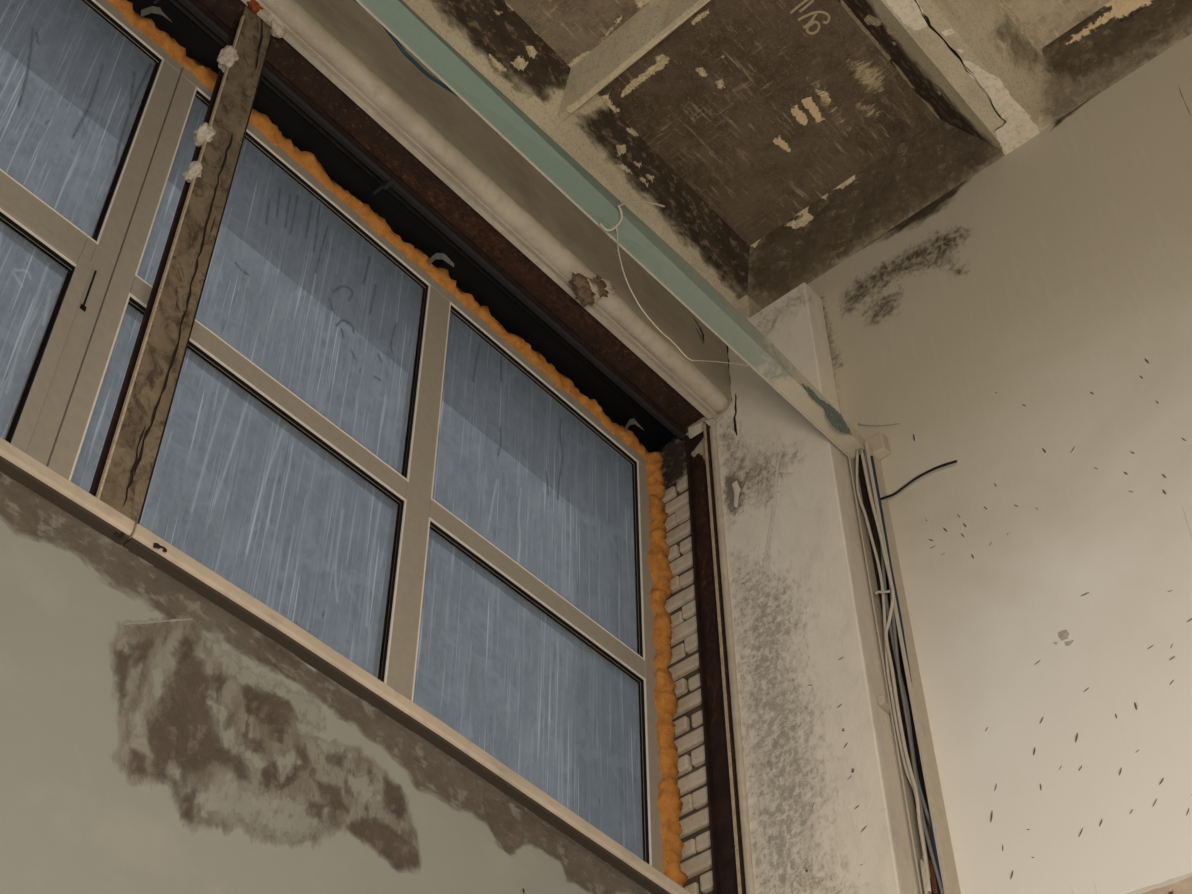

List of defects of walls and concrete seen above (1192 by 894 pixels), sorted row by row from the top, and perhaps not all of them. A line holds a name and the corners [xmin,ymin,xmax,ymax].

peeling [1066,0,1151,45]
peeling [489,32,537,72]
peeling [601,54,670,113]
peeling [695,67,725,89]
crack [915,0,1006,132]
peeling [791,89,831,126]
peeling [614,128,654,187]
peeling [773,135,790,152]
peeling [822,175,855,200]
peeling [787,206,813,229]
peeling [114,618,419,870]
flaking render [1142,876,1192,894]